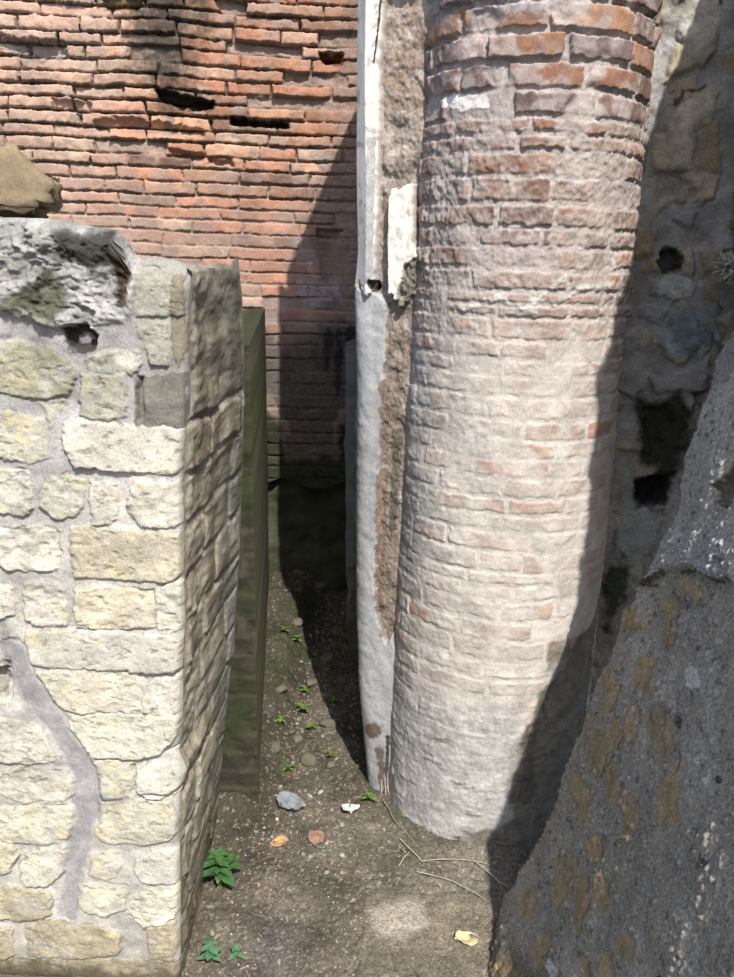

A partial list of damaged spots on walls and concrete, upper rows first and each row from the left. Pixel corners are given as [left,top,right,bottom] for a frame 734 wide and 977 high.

spalling [155,88,215,112]
spalling [230,115,289,129]
spalling [63,324,99,353]
leakage [266,325,356,444]
flaking render [374,301,437,637]
spalling [711,466,734,511]
corrosion [365,723,385,784]